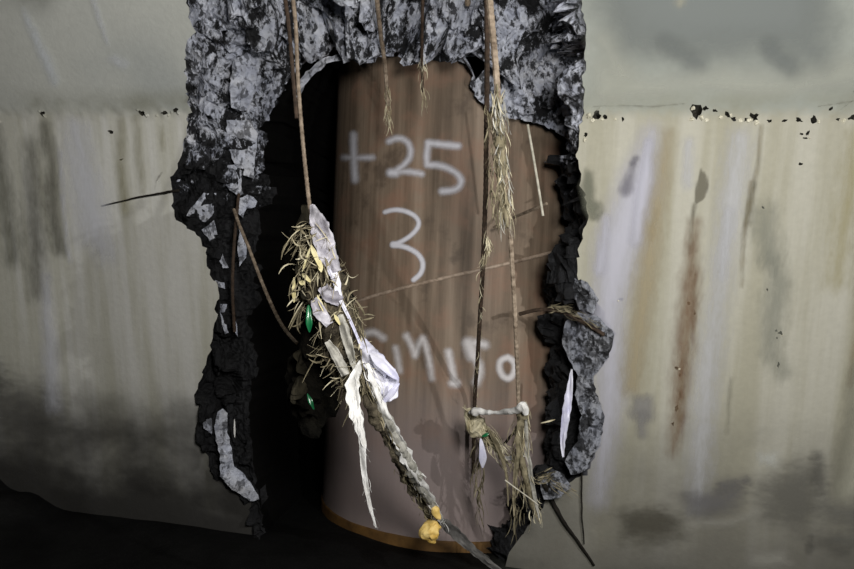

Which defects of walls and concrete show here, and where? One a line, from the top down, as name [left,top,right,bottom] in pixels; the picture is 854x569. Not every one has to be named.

damp [584,173,599,214]
damp [693,172,708,215]
spalling [689,104,820,126]
spalling [170,0,624,561]
damp [597,135,652,481]
rust [677,269,694,429]